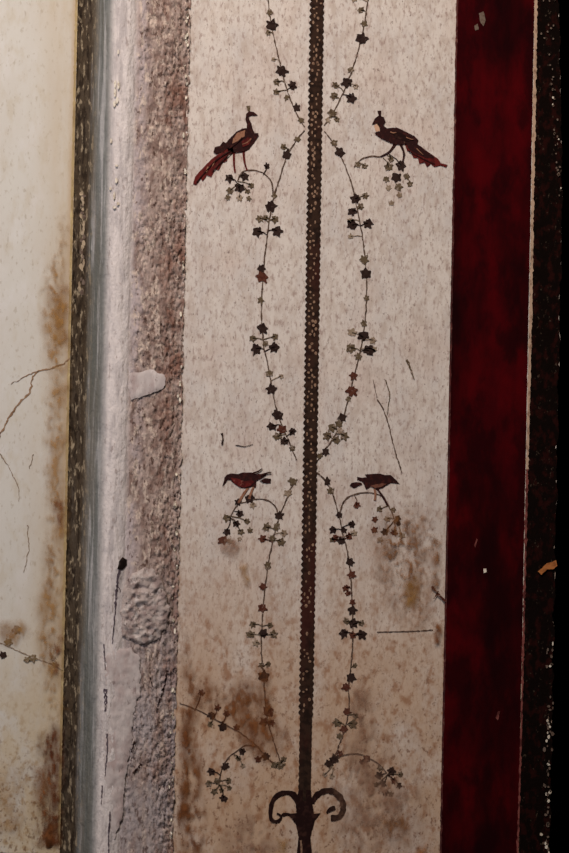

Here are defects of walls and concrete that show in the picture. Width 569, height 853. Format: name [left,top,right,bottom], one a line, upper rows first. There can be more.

crack [0,358,70,501]
leakage [50,416,64,538]
leakage [40,548,60,678]
leakage [381,518,425,612]